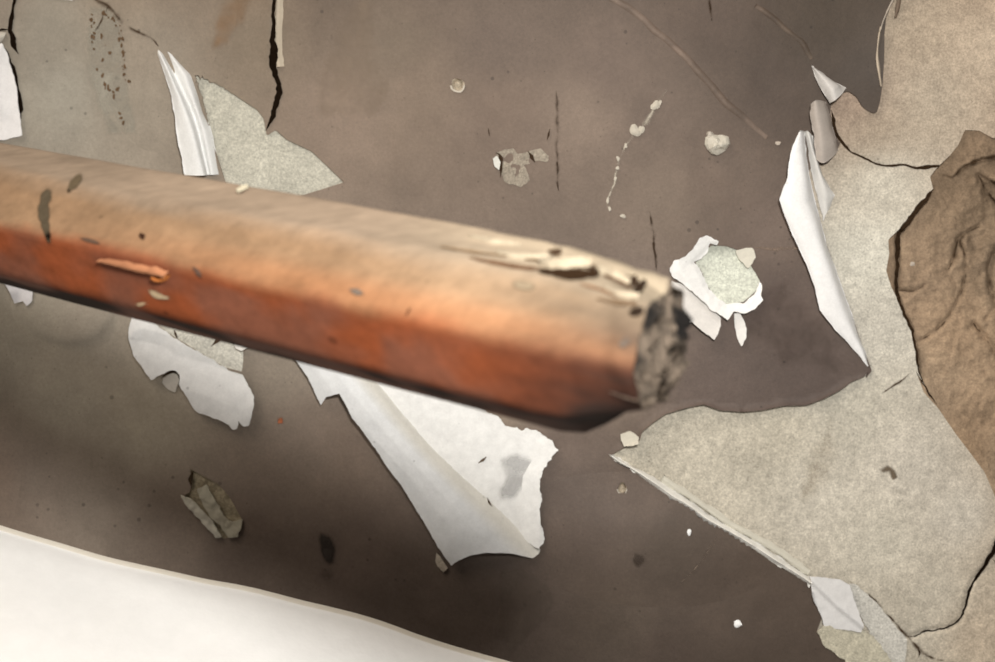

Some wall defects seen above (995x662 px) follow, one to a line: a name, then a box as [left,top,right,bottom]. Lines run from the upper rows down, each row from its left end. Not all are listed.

peeling [0,32,22,140]
crack [0,0,23,118]
crack [91,0,158,45]
peeling [158,50,343,195]
crack [266,0,284,130]
spalling [493,130,550,187]
peeling [6,285,33,306]
peeling [128,318,254,430]
peeling [609,0,995,662]
peeling [181,470,243,538]
peeling [298,362,558,572]
crack [869,541,995,658]